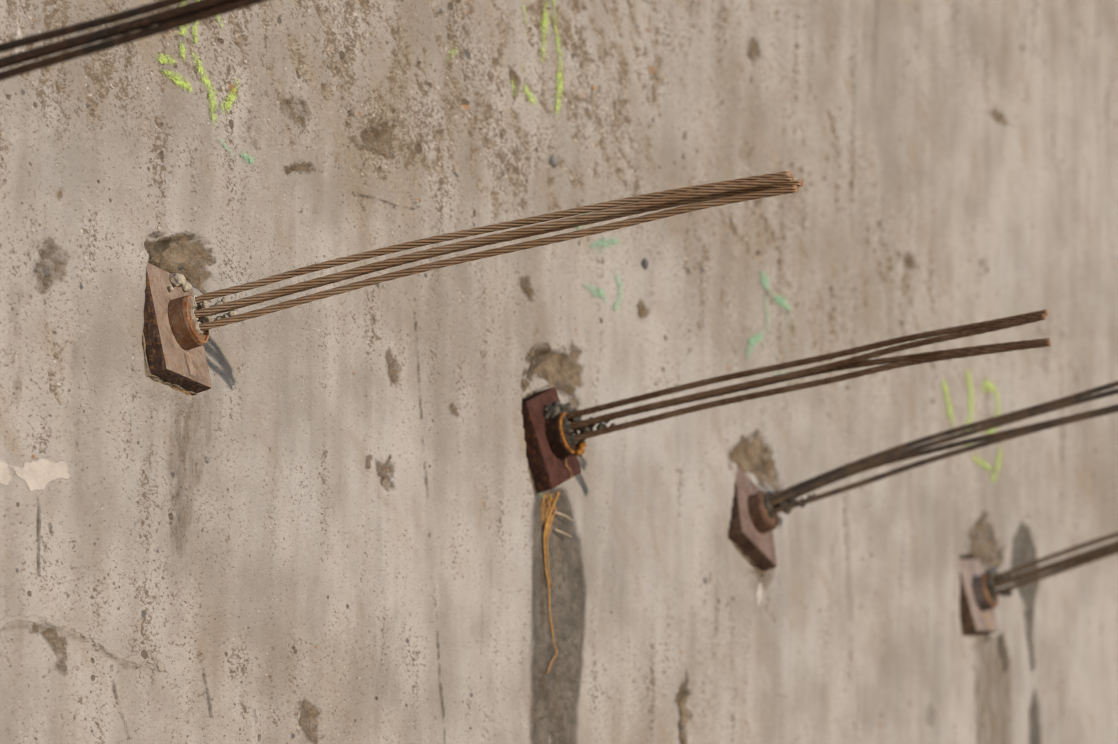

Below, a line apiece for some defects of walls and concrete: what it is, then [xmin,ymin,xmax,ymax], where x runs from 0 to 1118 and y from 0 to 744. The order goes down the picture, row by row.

spalling [144,232,216,302]
spalling [521,343,583,409]
peeling [0,458,70,491]
spalling [729,429,783,492]
damp [531,488,586,744]